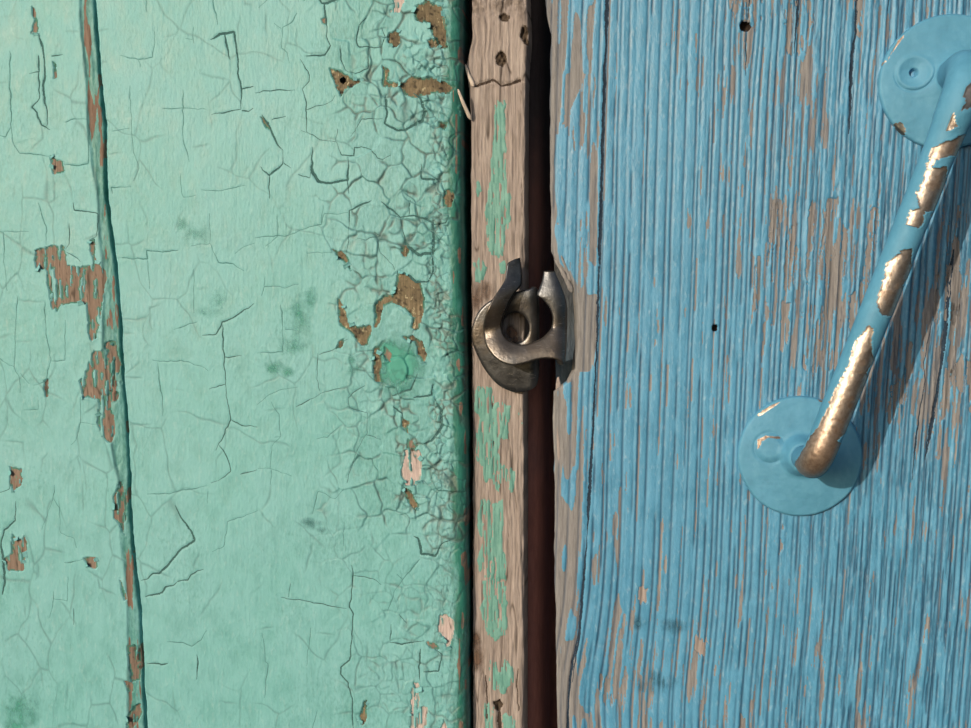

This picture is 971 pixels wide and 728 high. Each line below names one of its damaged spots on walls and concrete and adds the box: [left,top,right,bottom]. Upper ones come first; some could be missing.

crack [0,36,90,166]
peeling [382,66,455,98]
crack [0,204,99,389]
peeling [35,239,125,443]
crack [122,0,450,597]
peeling [336,271,427,383]
peeling [754,196,879,373]
crack [0,487,16,595]
peeling [2,535,28,572]
crack [147,630,207,680]
crack [281,522,458,728]
peeling [474,386,523,641]